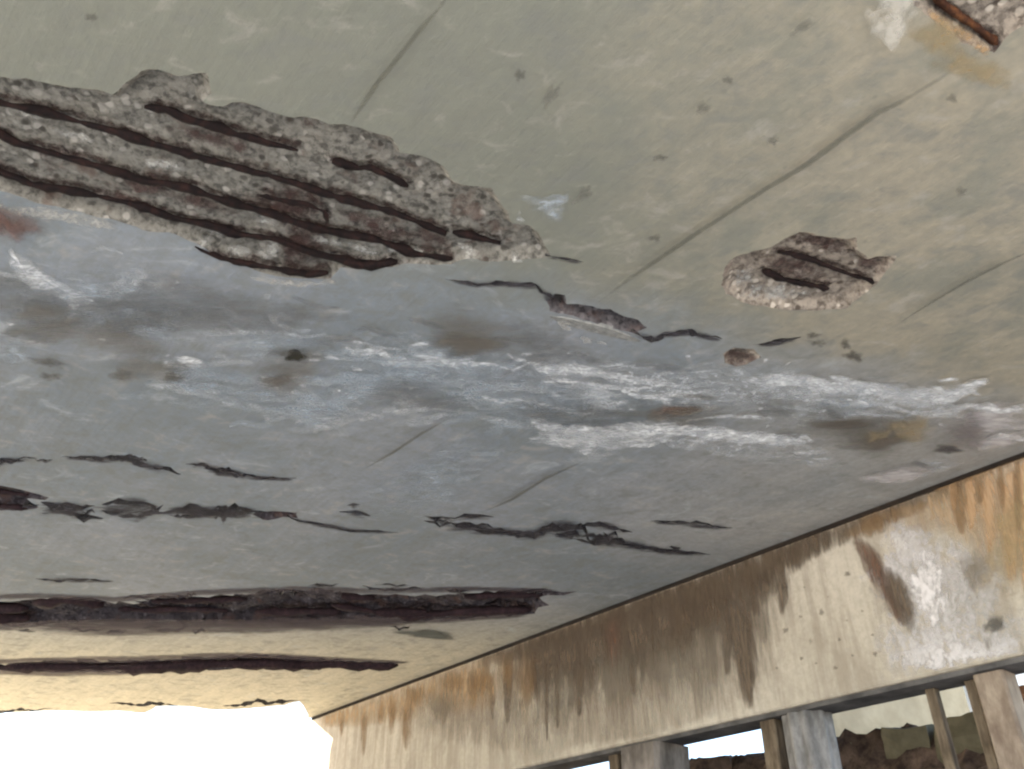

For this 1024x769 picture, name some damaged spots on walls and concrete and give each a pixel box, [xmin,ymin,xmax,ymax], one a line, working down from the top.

spalling [0,69,551,279]
leakage [4,254,186,341]
crack [446,279,722,343]
crack [756,333,815,346]
spalling [721,232,896,311]
leakage [150,315,1024,465]
crack [0,454,395,533]
crack [426,513,729,555]
spalling [0,583,576,640]
leakage [867,524,1017,668]
spalling [0,653,406,676]
leakage [325,567,788,753]